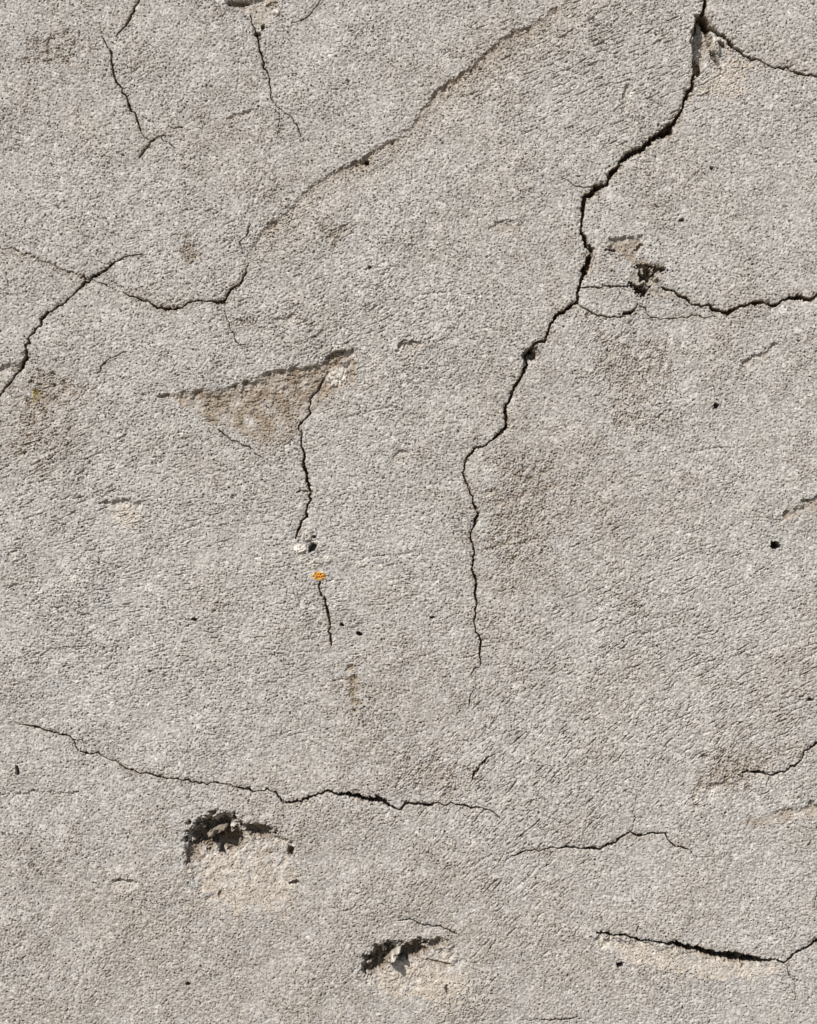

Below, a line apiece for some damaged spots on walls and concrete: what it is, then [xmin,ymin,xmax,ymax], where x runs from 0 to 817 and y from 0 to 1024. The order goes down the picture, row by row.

crack [100,0,184,160]
crack [0,223,253,398]
peeling [158,348,359,446]
crack [461,0,817,707]
crack [293,377,326,541]
crack [317,580,334,648]
crack [9,721,503,821]
crack [737,740,817,787]
spalling [181,810,301,920]
crack [509,794,695,858]
spalling [356,937,477,1005]
crack [595,925,817,1002]